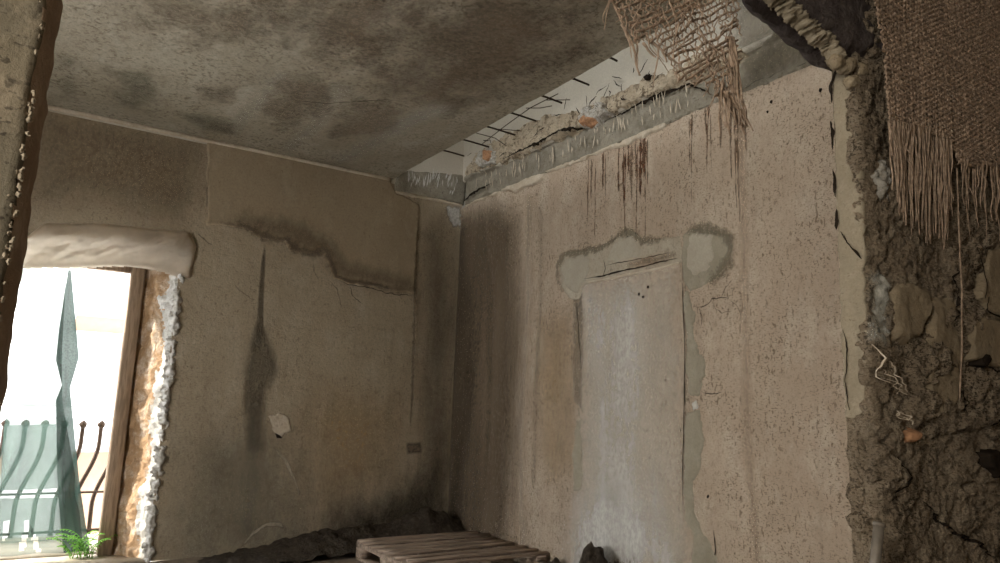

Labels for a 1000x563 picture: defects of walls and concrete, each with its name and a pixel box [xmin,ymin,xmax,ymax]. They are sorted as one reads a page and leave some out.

water stain [380,0,589,104]
rust [587,138,648,232]
spalling [394,0,909,421]
crack [829,71,862,259]
water stain [237,220,407,453]
flaking render [887,248,1000,413]
flaking render [902,427,923,443]